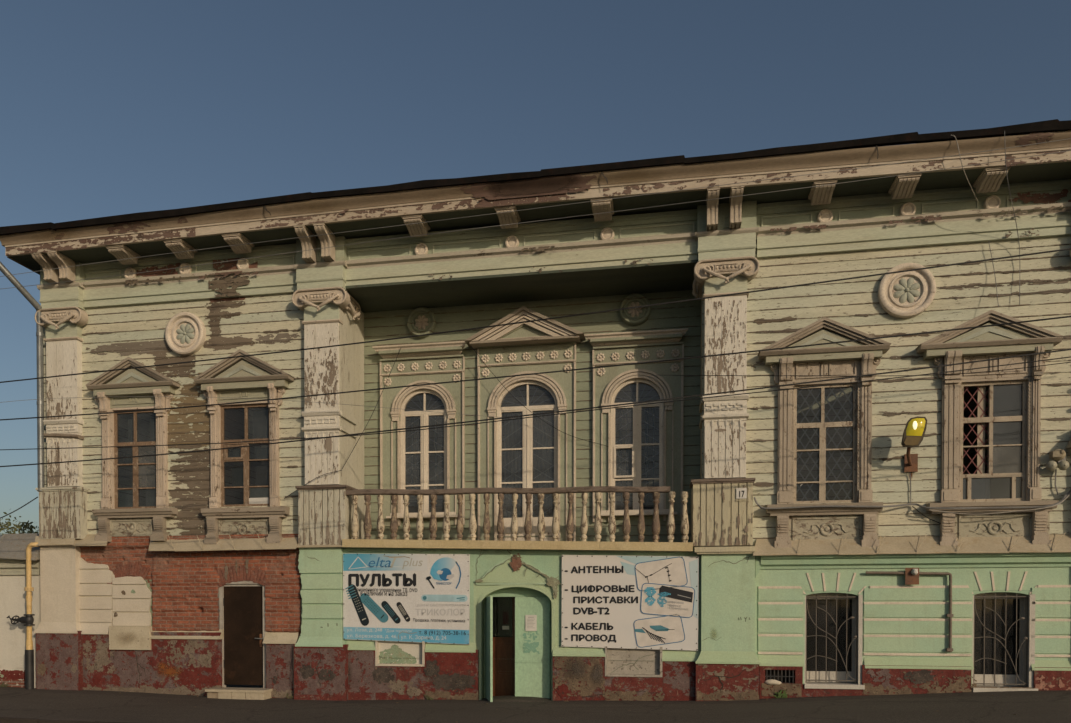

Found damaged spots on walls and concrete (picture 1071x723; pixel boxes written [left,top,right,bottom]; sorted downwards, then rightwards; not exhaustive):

peeling [249,167,857,229]
peeling [937,260,1071,300]
peeling [705,300,802,394]
flaking render [0,257,478,700]
peeling [693,423,774,546]
flaking render [553,656,802,701]
flaking render [863,669,1071,695]